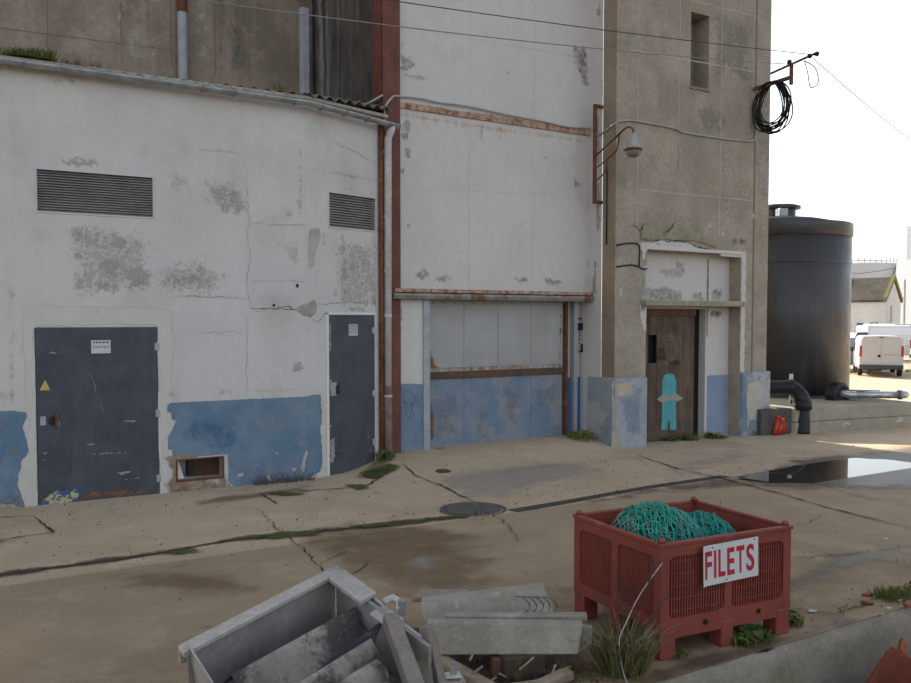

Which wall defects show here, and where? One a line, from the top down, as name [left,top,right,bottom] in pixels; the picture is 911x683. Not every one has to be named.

crack [175,149,302,392]
peeling [308,228,325,269]
peeling [633,240,701,332]
spalling [166,454,243,493]